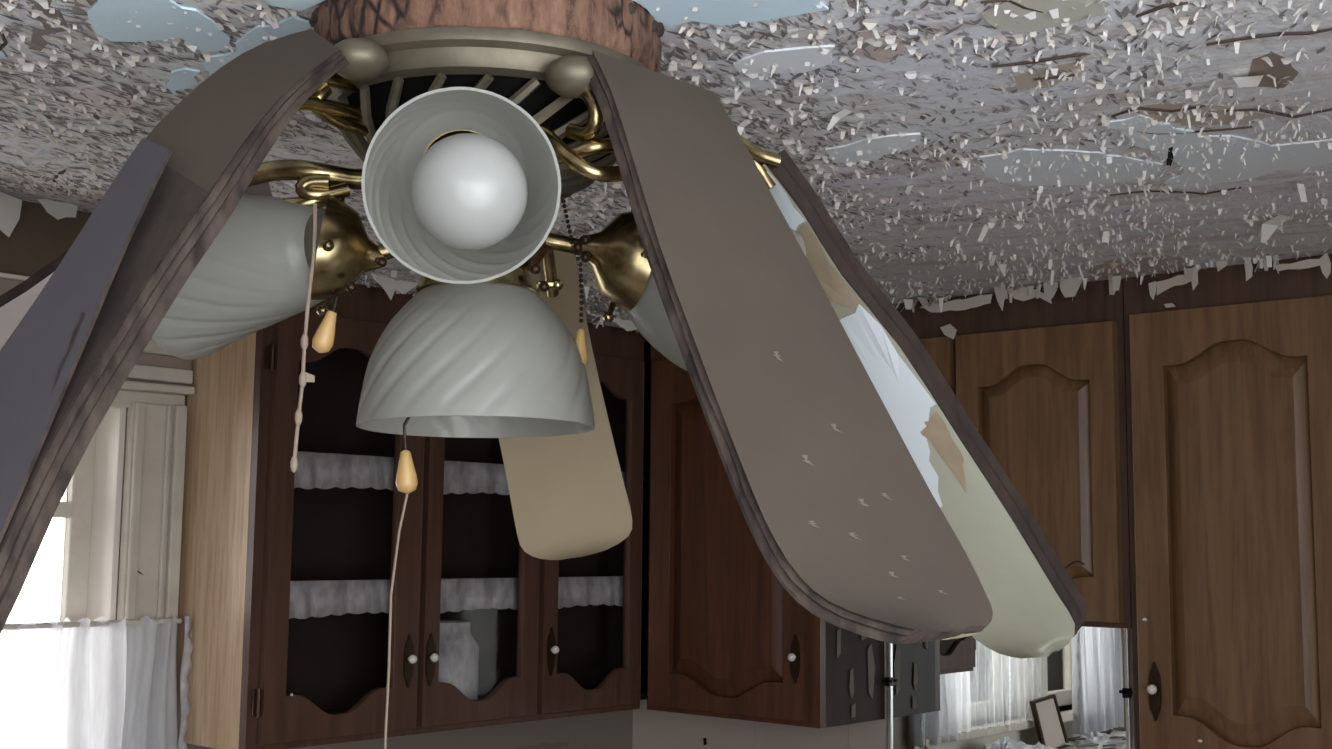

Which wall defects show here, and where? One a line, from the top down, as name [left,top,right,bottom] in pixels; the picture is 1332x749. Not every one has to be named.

crack [981,0,1044,13]
crack [1136,2,1188,18]
crack [0,32,8,51]
crack [1206,28,1332,46]
crack [991,53,1091,81]
crack [1111,105,1332,135]
peeling [268,113,364,169]
peeling [633,0,1332,340]
peeling [555,163,631,239]
crack [1110,187,1241,196]
peeling [345,189,381,245]
peeling [577,263,639,333]